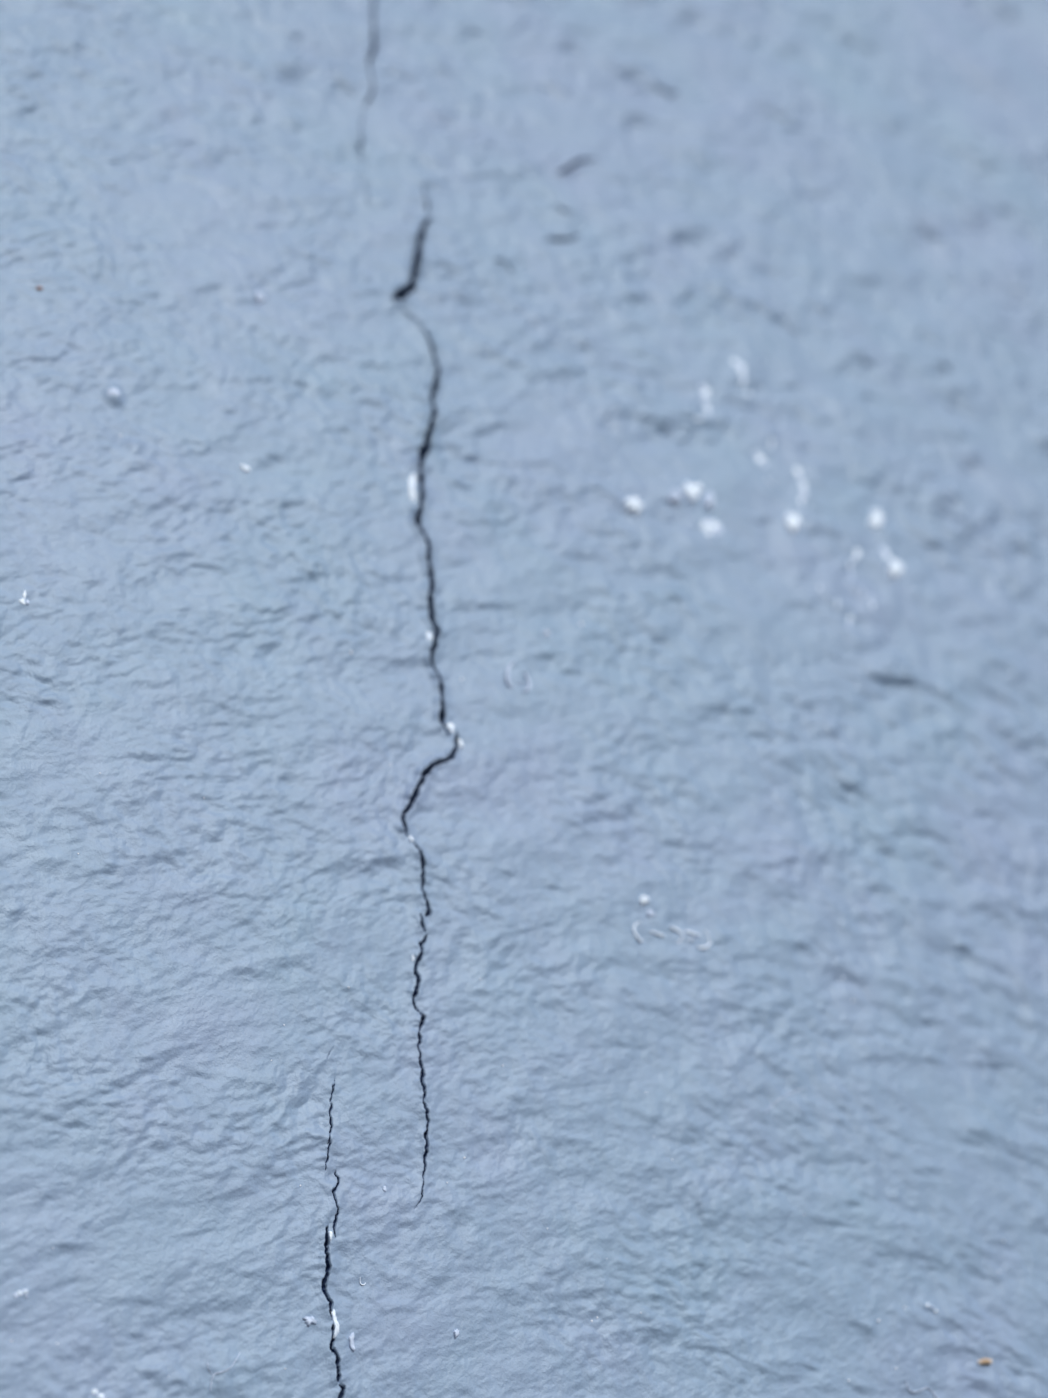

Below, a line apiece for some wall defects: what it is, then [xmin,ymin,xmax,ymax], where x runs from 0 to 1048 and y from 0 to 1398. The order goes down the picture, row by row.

crack [392,187,464,1208]
crack [321,1051,345,1398]